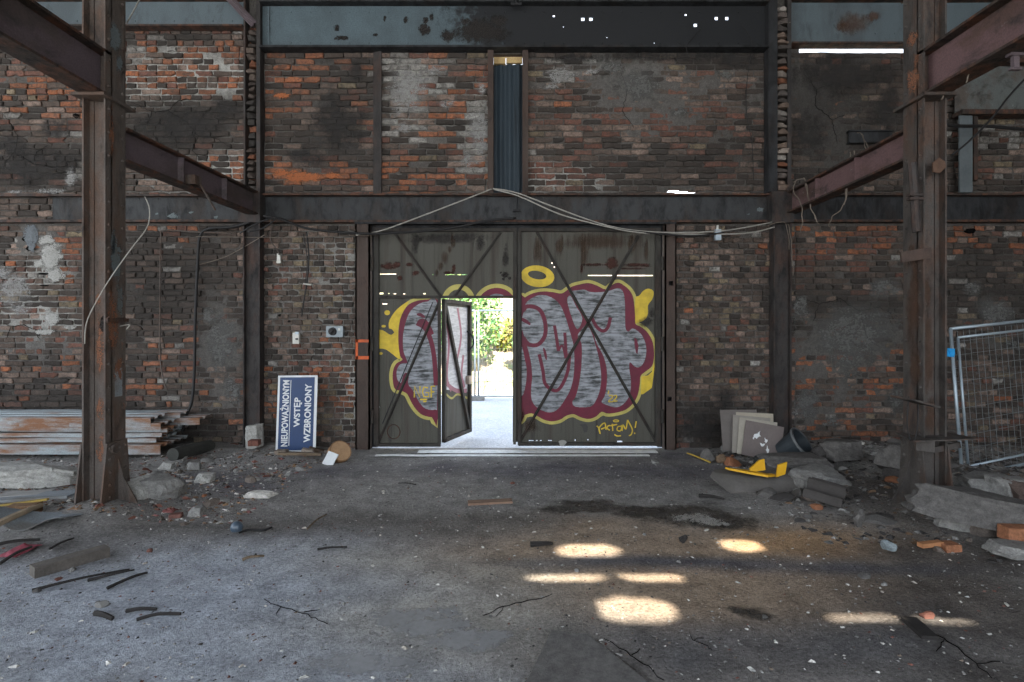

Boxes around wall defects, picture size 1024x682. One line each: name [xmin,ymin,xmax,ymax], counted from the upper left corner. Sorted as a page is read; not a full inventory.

spalling [0,234,66,315]
spalling [35,309,77,335]
corrosion [95,281,124,381]
leakage [542,500,755,530]
crack [264,599,328,624]
crack [483,594,552,616]
crack [936,634,1000,678]